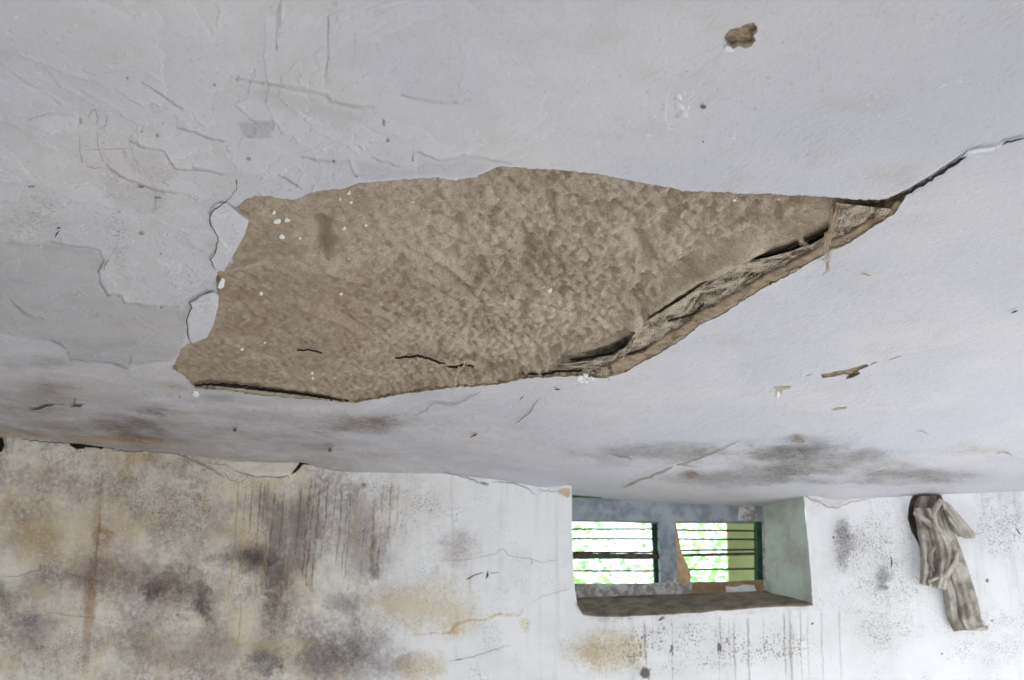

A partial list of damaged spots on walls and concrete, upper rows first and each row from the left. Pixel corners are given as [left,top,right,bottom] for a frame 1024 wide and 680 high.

spalling [725,22,757,52]
crack [877,131,1024,202]
spalling [42,166,907,403]
water stain [102,472,320,626]
water stain [837,526,917,643]